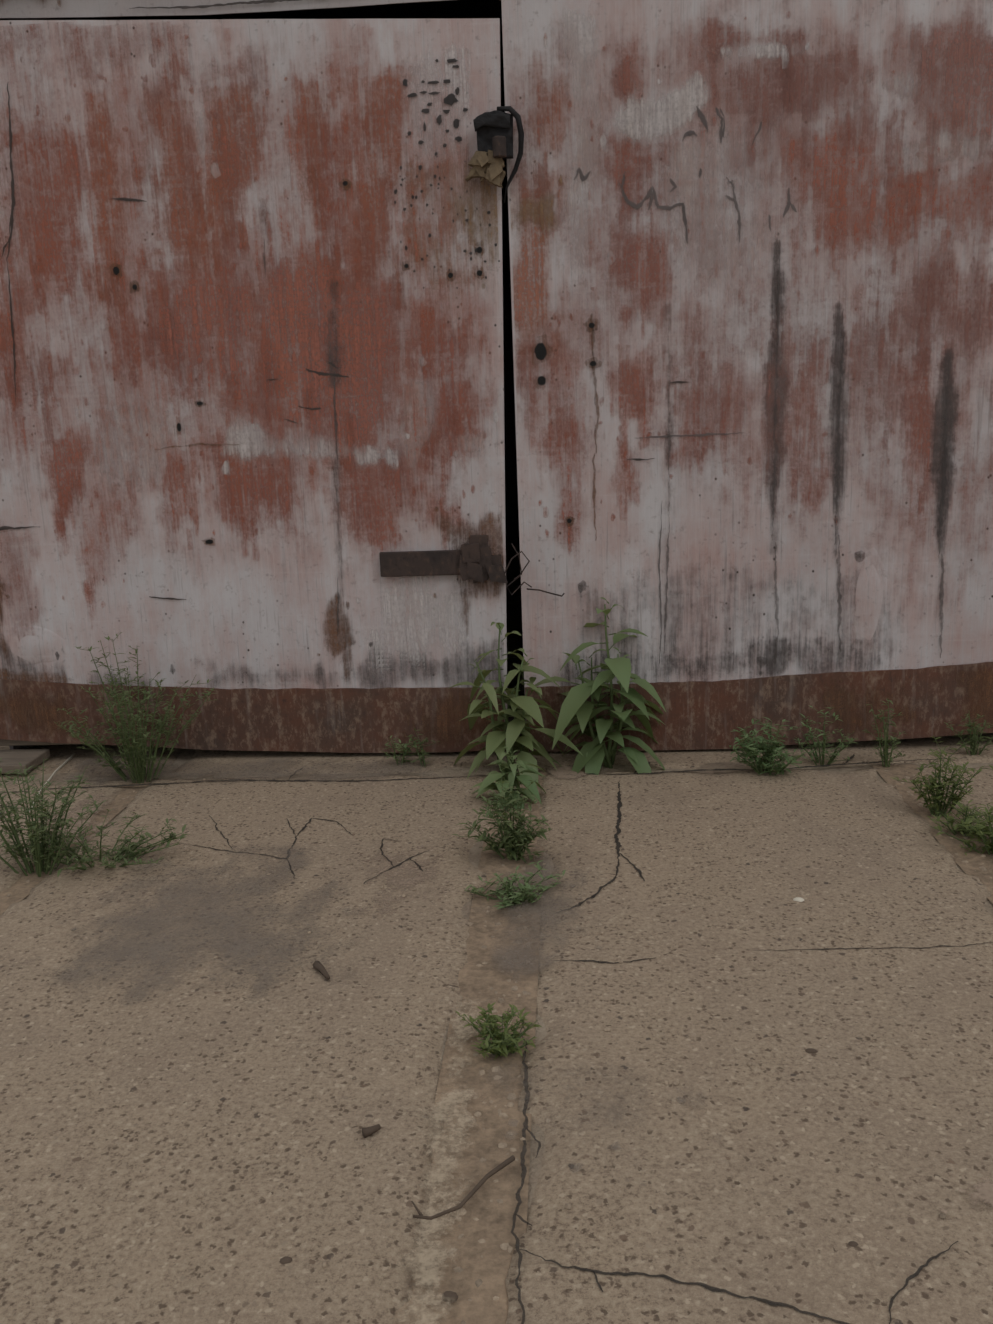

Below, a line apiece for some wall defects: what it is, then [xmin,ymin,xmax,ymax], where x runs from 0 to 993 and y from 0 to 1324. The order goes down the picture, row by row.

rust [394,156,500,279]
leakage [766,242,788,519]
rust [318,594,355,676]
rust [435,507,504,623]
leakage [832,304,845,652]
leakage [932,351,958,658]
crack [140,817,426,884]
crack [559,754,967,912]
crack [511,1019,850,1324]
crack [889,1241,958,1324]